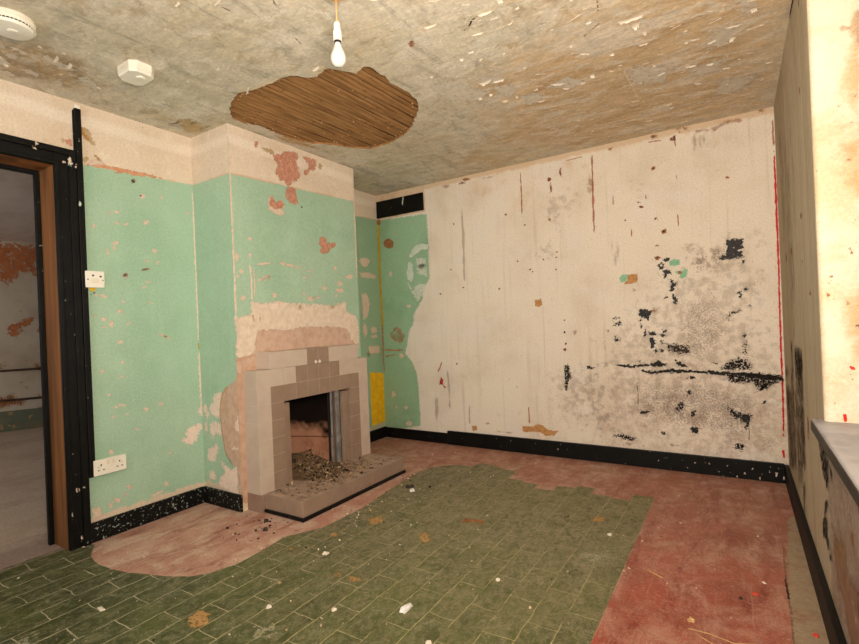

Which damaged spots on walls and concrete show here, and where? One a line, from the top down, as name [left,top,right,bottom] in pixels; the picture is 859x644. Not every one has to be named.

peeling [565,6,648,47]
peeling [430,0,600,133]
peeling [610,0,776,143]
peeling [0,241,37,286]
peeling [619,274,638,284]
peeling [7,317,39,337]
flaking render [182,123,380,503]
peeling [522,407,559,440]
water stain [675,390,699,434]
water stain [721,334,806,512]
water stain [834,538,859,644]